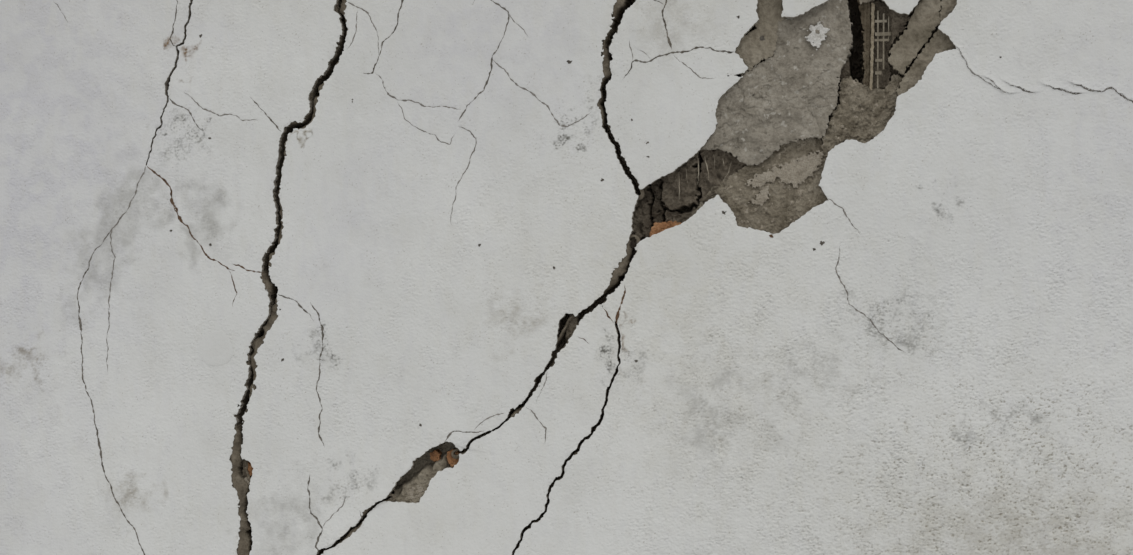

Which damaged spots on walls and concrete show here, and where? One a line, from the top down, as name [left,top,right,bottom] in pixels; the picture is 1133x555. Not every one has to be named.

flaking render [631,0,957,254]
crack [957,47,1133,103]
crack [77,0,732,555]
crack [829,199,904,352]
flaking render [387,441,462,502]